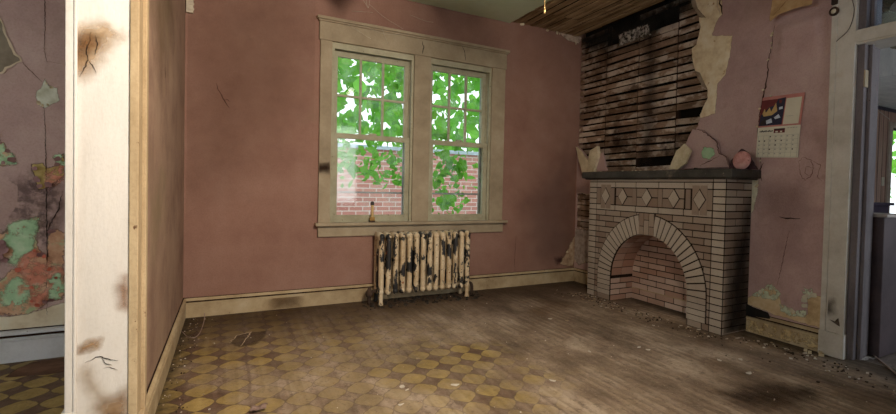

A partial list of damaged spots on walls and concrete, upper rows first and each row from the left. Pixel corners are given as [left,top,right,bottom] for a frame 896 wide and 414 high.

flaking render [0,18,22,74]
crack [23,0,56,82]
peeling [36,80,59,108]
crack [80,35,98,75]
spalling [409,0,550,26]
spalling [546,0,732,172]
peeling [31,153,65,189]
crack [44,110,63,311]
peeling [0,217,65,330]
peeling [746,284,821,349]